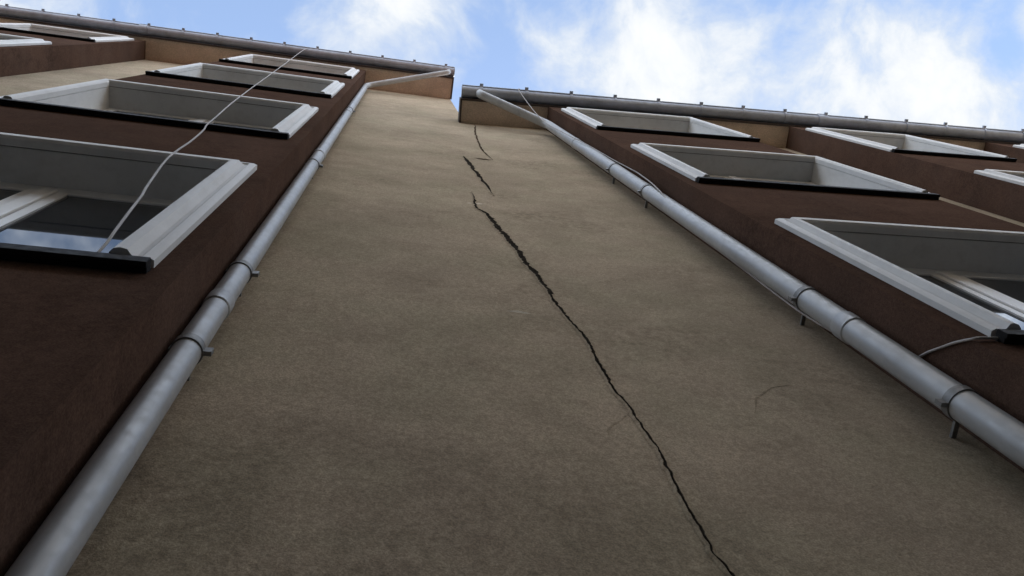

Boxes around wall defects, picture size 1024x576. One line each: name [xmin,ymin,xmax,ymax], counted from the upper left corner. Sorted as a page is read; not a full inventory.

crack [462,126,737,576]